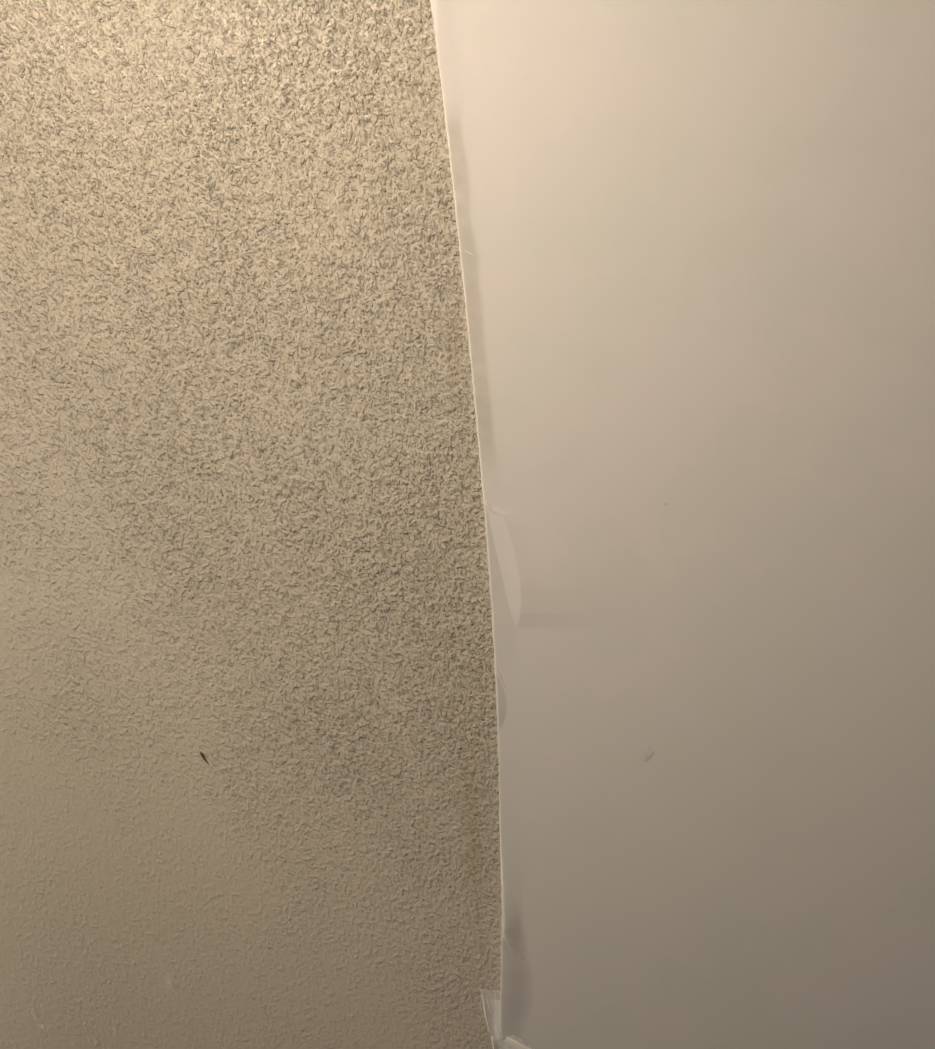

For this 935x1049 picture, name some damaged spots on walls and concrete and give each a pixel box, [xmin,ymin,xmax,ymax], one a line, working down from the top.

peeling [500,884,533,1038]